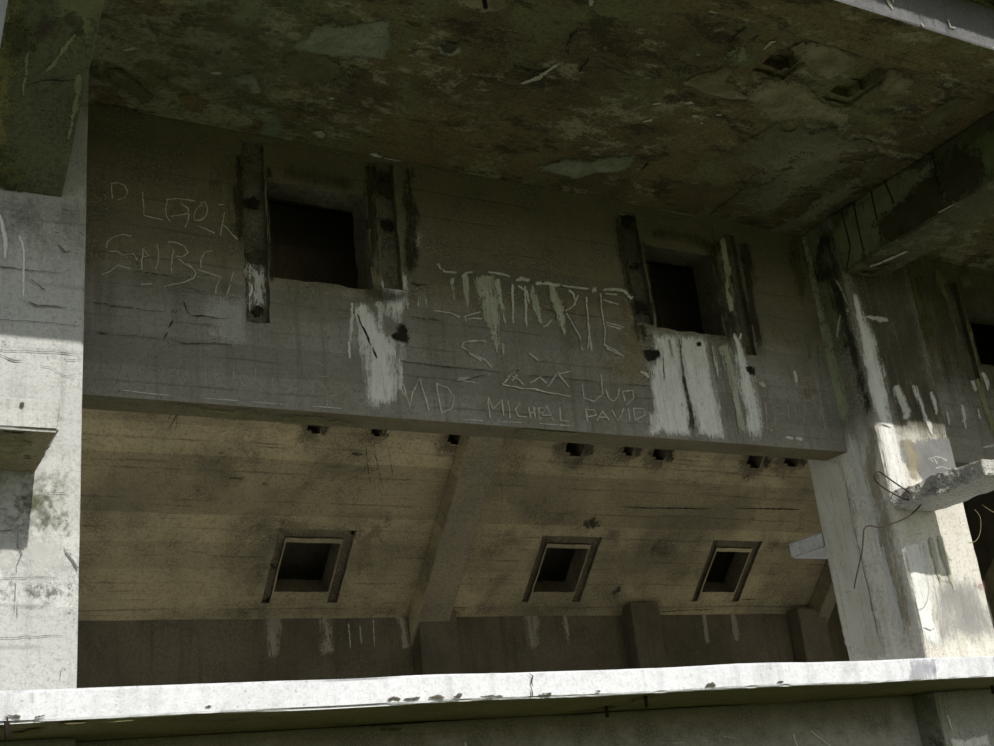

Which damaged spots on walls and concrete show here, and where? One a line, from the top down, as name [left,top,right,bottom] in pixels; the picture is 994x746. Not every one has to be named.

leakage [46,0,103,72]
spalling [683,27,863,128]
leakage [789,235,994,679]
crack [0,509,62,638]